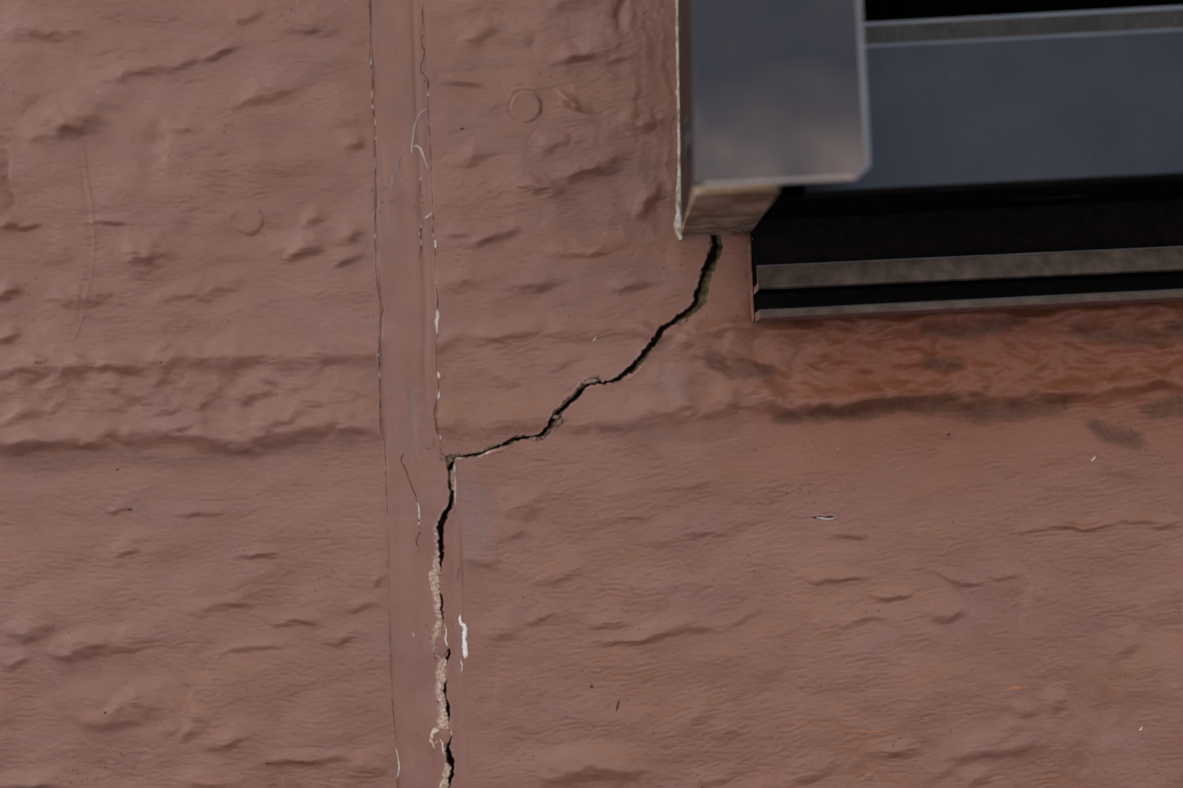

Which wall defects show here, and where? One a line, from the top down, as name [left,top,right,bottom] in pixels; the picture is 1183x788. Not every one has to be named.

peeling [459,614,468,673]
crack [367,0,725,788]